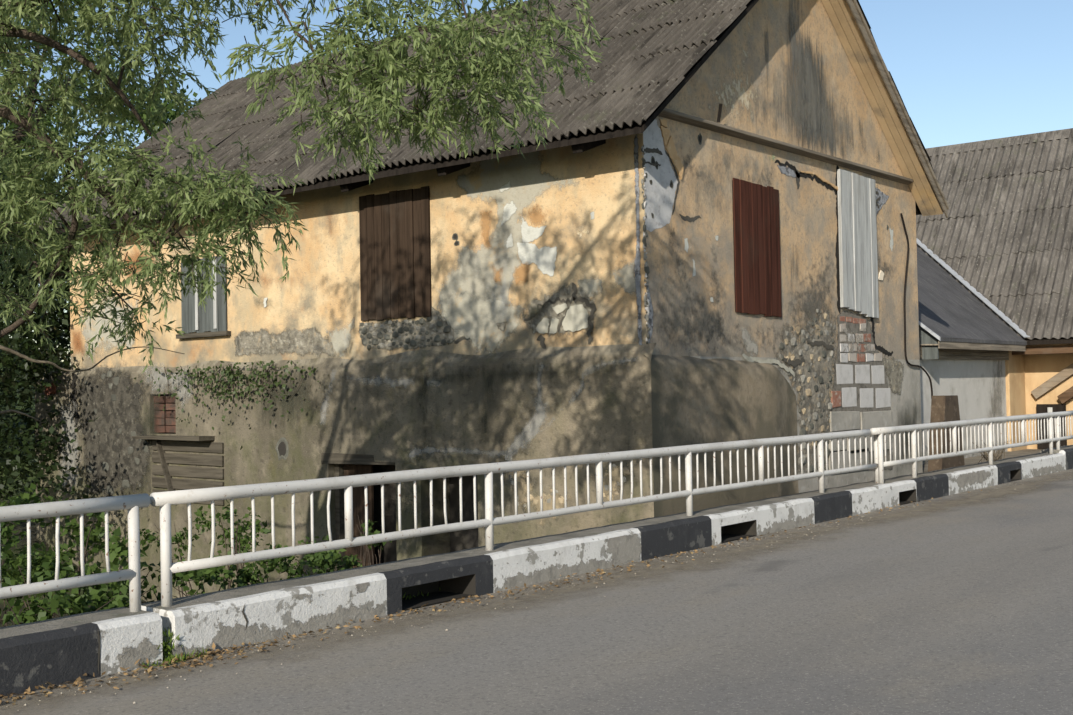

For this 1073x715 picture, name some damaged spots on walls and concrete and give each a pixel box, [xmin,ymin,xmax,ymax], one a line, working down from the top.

damp [787,7,844,154]
peeling [234,151,602,357]
peeling [613,119,684,345]
crack [775,159,841,313]
flaking render [742,308,904,474]
crack [871,318,893,356]
peeling [117,582,386,671]
peeling [495,534,642,592]